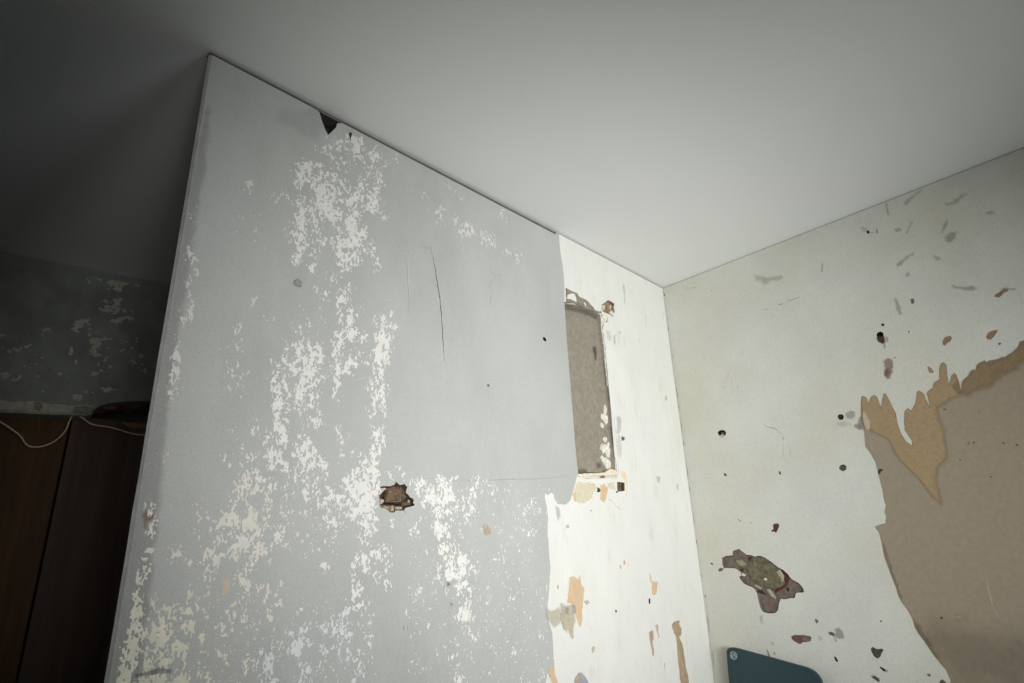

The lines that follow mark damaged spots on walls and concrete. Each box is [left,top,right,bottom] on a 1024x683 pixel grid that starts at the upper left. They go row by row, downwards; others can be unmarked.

crack [419,245,444,351]
flaking render [116,110,804,683]
peeling [861,340,1024,683]